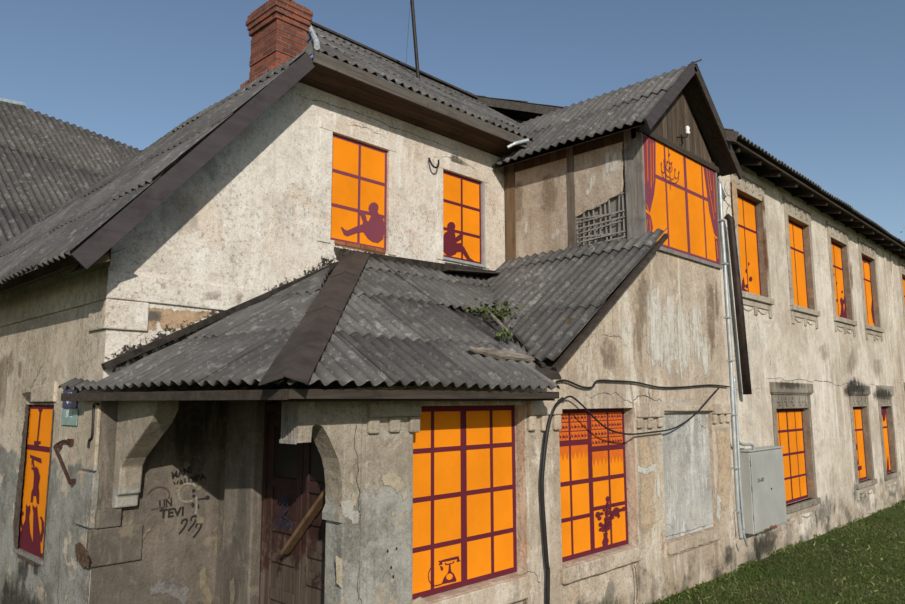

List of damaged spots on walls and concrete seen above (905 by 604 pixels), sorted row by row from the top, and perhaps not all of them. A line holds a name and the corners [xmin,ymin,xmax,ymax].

water stain [586,151,617,196]
spalling [104,307,222,372]
water stain [642,279,709,378]
water stain [847,378,891,399]
spalling [340,473,360,524]
water stain [2,561,38,604]
spalling [75,542,90,568]
peeling [149,566,213,604]
peeling [335,556,343,588]
water stain [754,530,775,561]